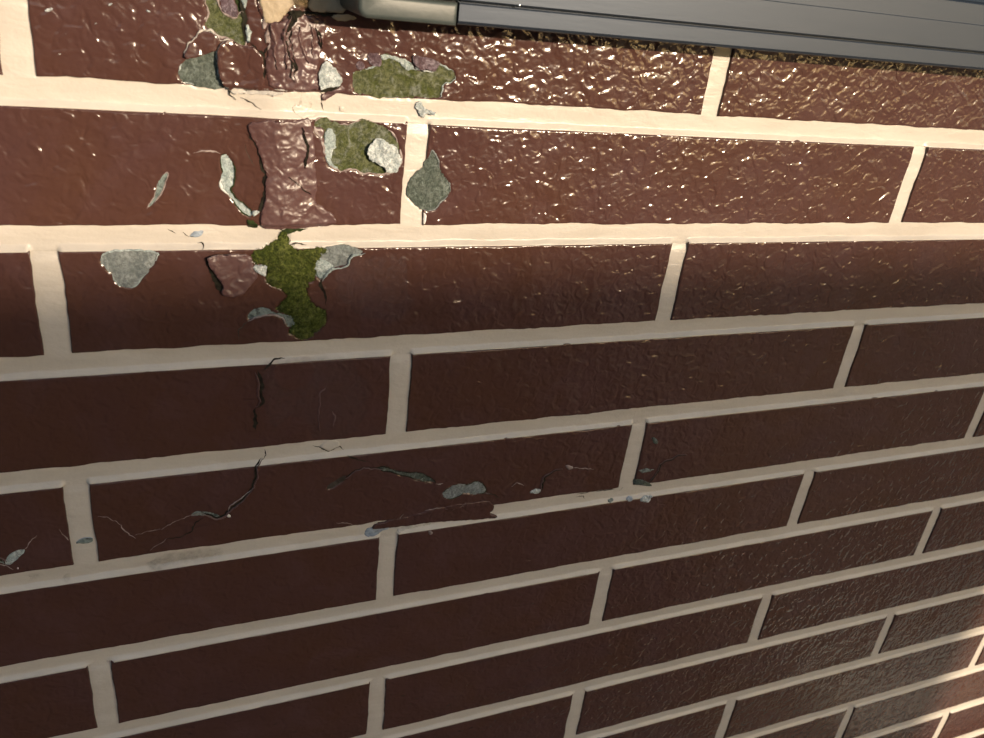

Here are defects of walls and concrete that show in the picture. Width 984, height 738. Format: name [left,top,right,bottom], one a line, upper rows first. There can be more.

peeling [178,0,357,97]
peeling [319,53,456,118]
peeling [314,117,403,176]
peeling [147,172,169,208]
peeling [195,150,259,228]
peeling [406,150,451,226]
peeling [101,249,159,288]
peeling [168,229,267,298]
peeling [315,244,365,281]
crack [98,357,285,550]
crack [315,440,443,489]
crack [0,537,36,569]